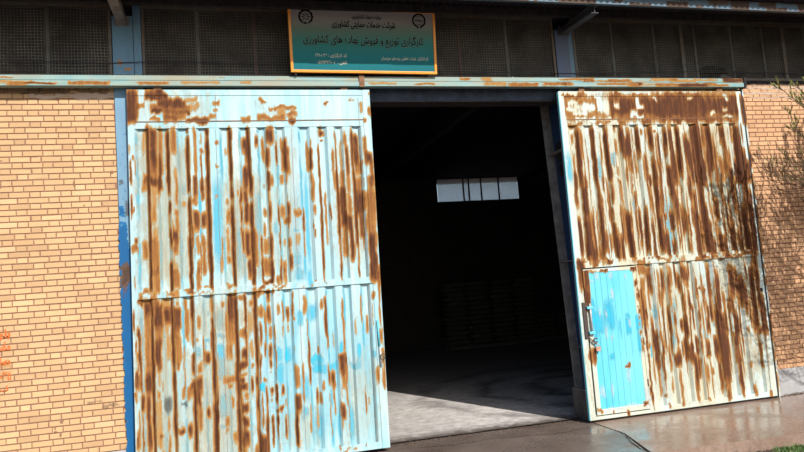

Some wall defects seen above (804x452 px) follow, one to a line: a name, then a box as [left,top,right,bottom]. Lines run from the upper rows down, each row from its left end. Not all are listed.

corrosion [0,76,57,85]
corrosion [120,81,386,452]
corrosion [349,82,397,123]
corrosion [459,77,779,411]